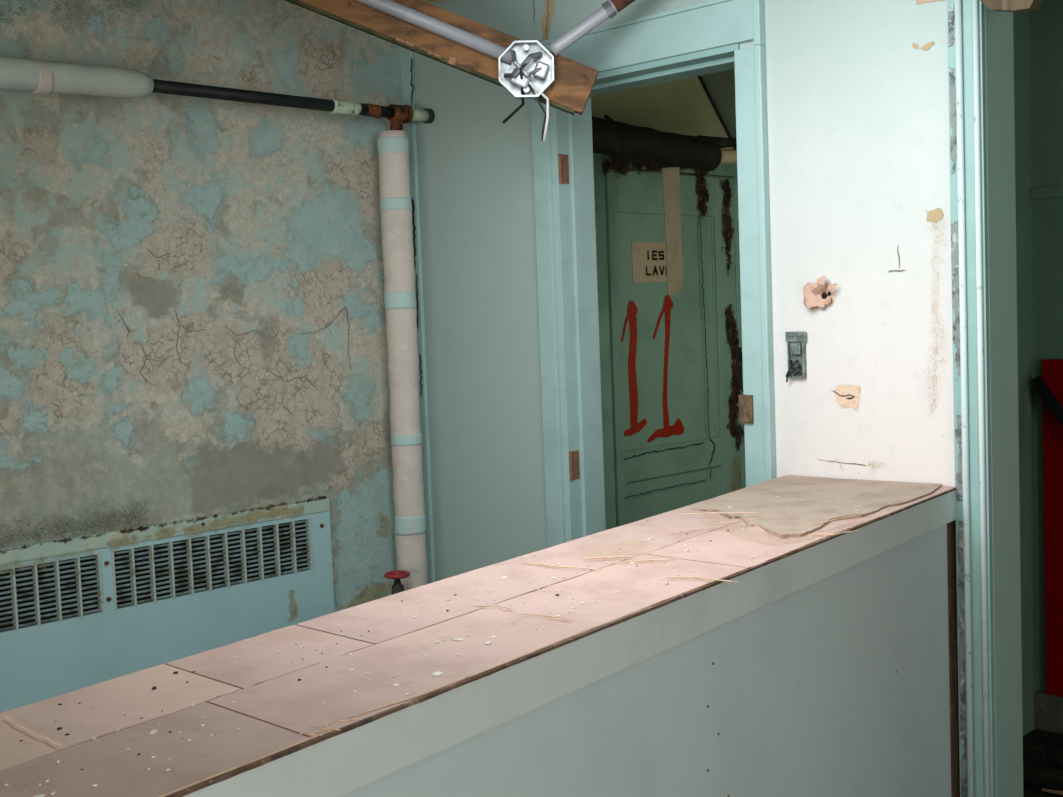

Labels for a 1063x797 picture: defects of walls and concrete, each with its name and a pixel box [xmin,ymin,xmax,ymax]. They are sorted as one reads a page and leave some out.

peeling [233,28,351,112]
peeling [322,115,387,236]
rust [599,156,716,222]
spalling [803,276,837,310]
peeling [108,266,197,400]
crack [116,310,266,384]
crack [299,306,351,367]
crack [270,363,319,416]
spalling [831,384,861,411]
rust [0,495,327,577]